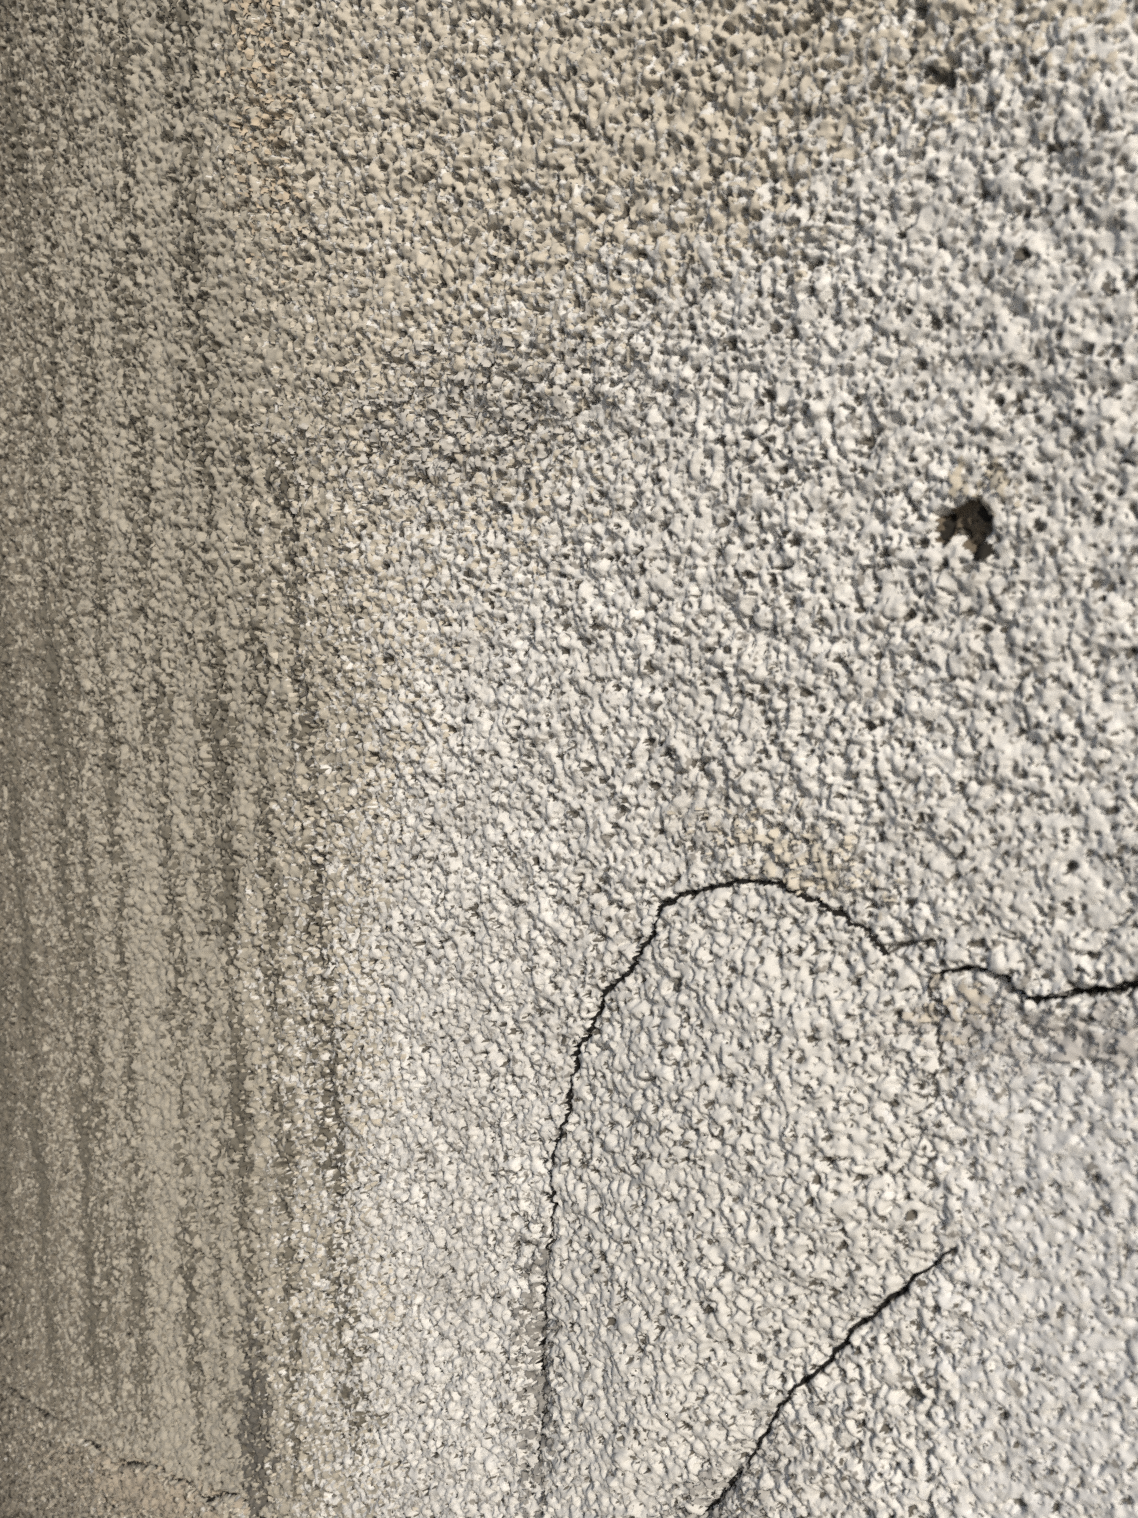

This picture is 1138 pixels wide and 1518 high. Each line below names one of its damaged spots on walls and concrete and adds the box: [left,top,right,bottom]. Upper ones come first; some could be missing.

water stain [1078,38,1120,87]
water stain [1020,99,1038,111]
water stain [869,122,902,156]
water stain [618,304,641,322]
water stain [647,299,669,362]
crack [284,479,360,1435]
water stain [382,1034,407,1065]
crack [535,879,1138,1463]
crack [703,1248,956,1516]
crack [4,1384,265,1518]
water stain [359,1478,400,1512]